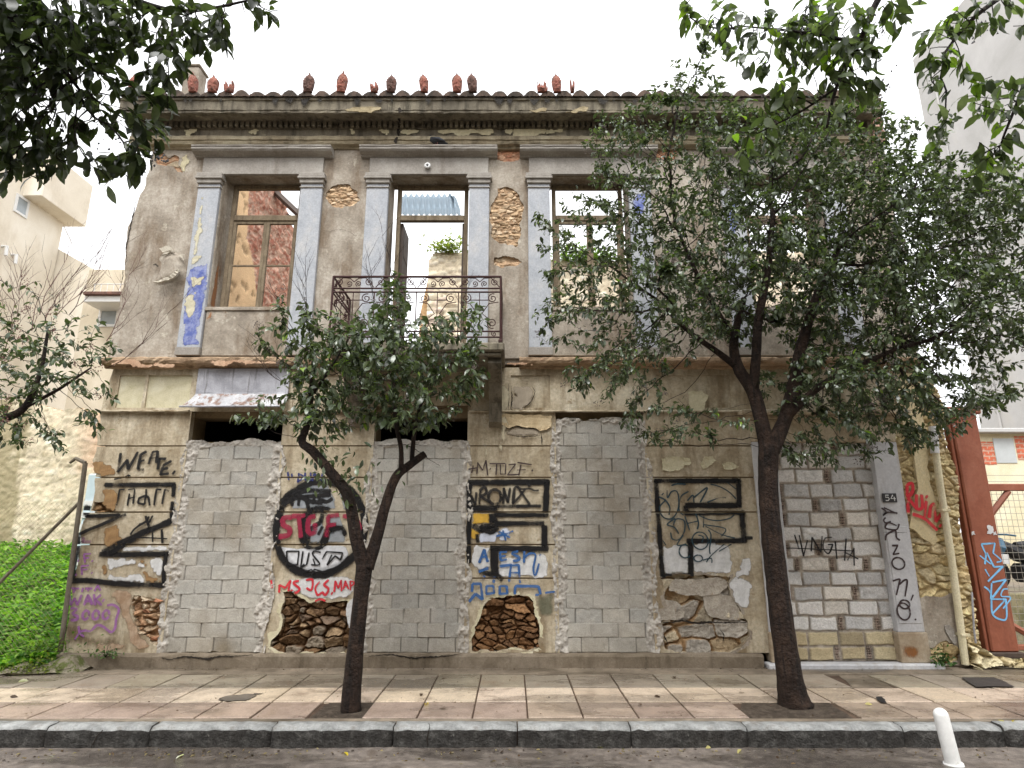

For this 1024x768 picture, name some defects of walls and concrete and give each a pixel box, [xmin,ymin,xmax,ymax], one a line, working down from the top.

flaking render [154,153,189,173]
flaking render [326,185,360,208]
flaking render [489,188,524,268]
flaking render [112,359,175,368]
flaking render [502,387,552,436]
flaking render [93,461,115,476]
flaking render [93,489,167,652]
peeling [663,543,752,608]
peeling [290,576,353,628]
flaking render [267,620,282,647]